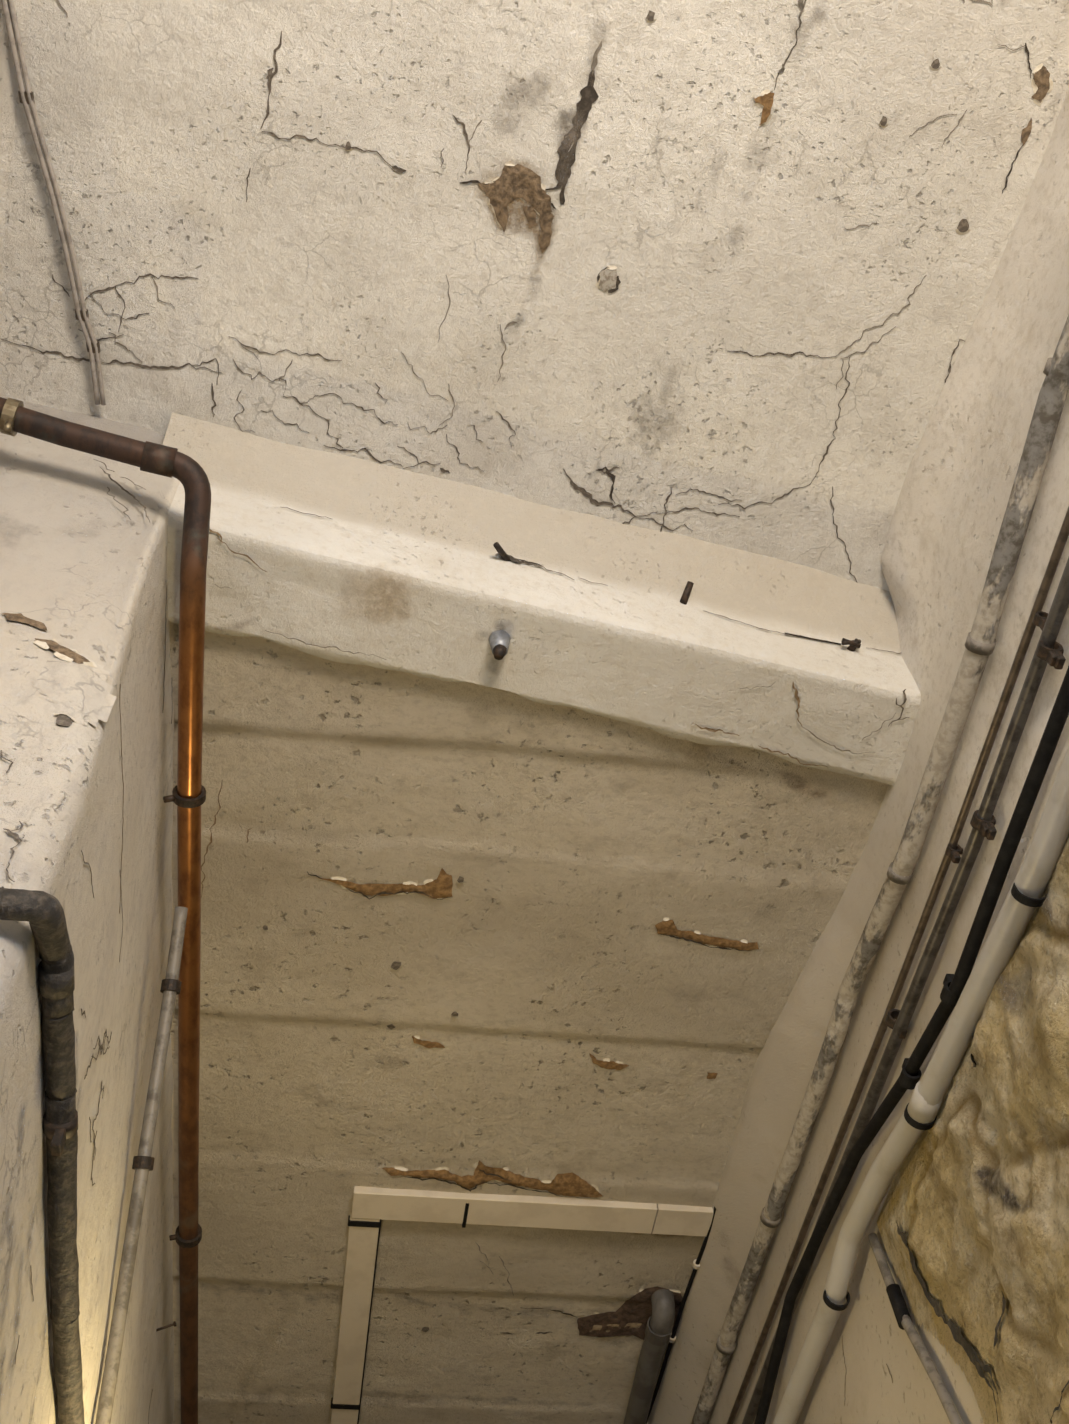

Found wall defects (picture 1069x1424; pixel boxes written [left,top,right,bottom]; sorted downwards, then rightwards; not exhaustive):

crack [774,0,806,90]
crack [261,31,406,173]
crack [441,115,482,171]
crack [546,41,602,205]
peeling [754,90,774,127]
spalling [998,43,1053,194]
spalling [460,161,556,253]
crack [2,273,517,474]
crack [563,275,926,582]
crack [94,459,150,522]
crack [495,553,608,586]